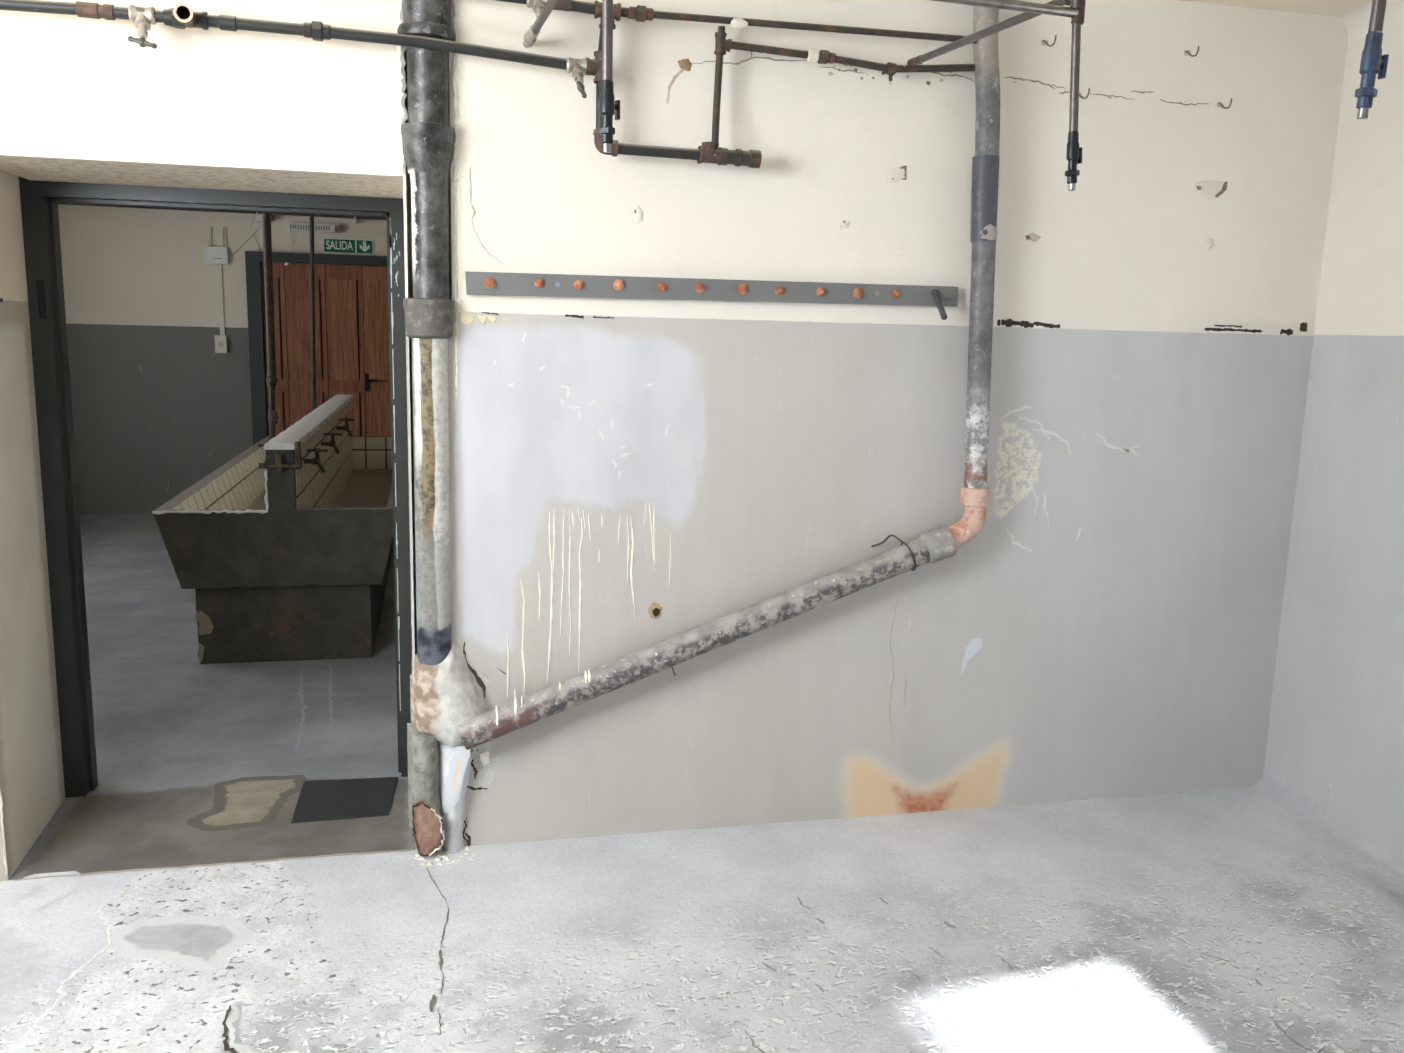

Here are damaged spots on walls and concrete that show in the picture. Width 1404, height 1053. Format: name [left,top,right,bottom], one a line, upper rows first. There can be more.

flaking render [466,736,508,797]
flaking render [412,799,445,857]
crack [463,817,471,846]
crack [426,867,449,1034]